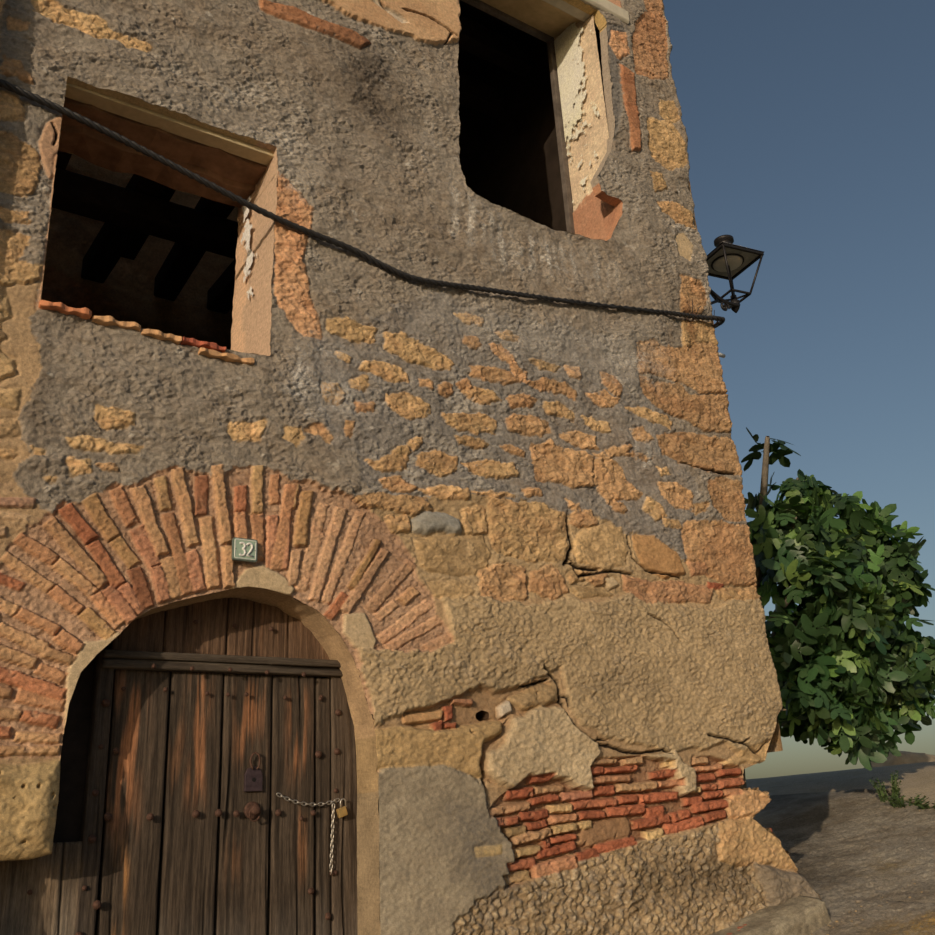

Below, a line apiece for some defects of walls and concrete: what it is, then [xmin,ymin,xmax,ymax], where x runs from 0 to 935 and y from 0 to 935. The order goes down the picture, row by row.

peeling [258,0,462,50]
crack [380,0,459,45]
peeling [554,22,601,190]
flaking render [606,0,697,261]
flaking render [273,170,760,604]
flaking render [43,402,146,484]
crack [562,515,682,579]
crack [648,612,682,642]
flaking render [401,680,561,784]
crack [519,665,675,754]
crack [707,733,770,754]
flaking render [452,739,820,935]